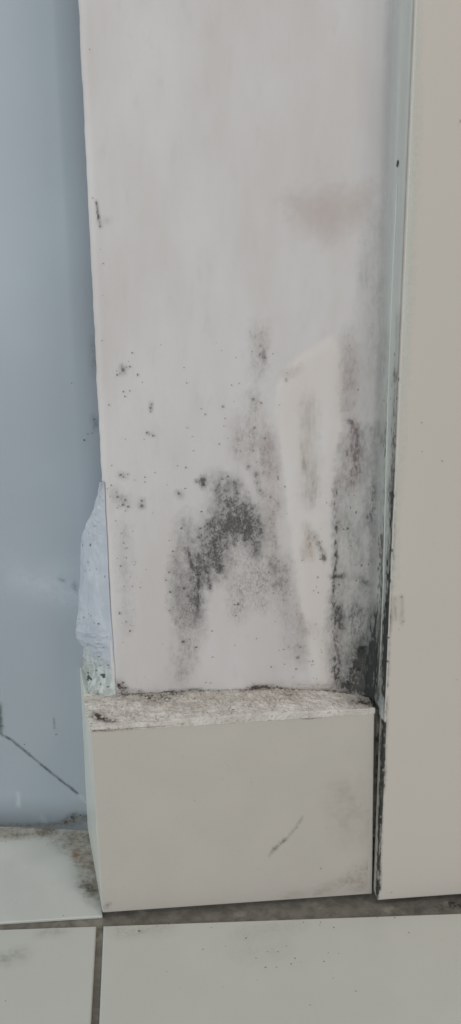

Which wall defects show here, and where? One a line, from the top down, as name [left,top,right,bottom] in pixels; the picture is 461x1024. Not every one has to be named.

leakage [169,476,276,617]
leakage [338,370,399,897]